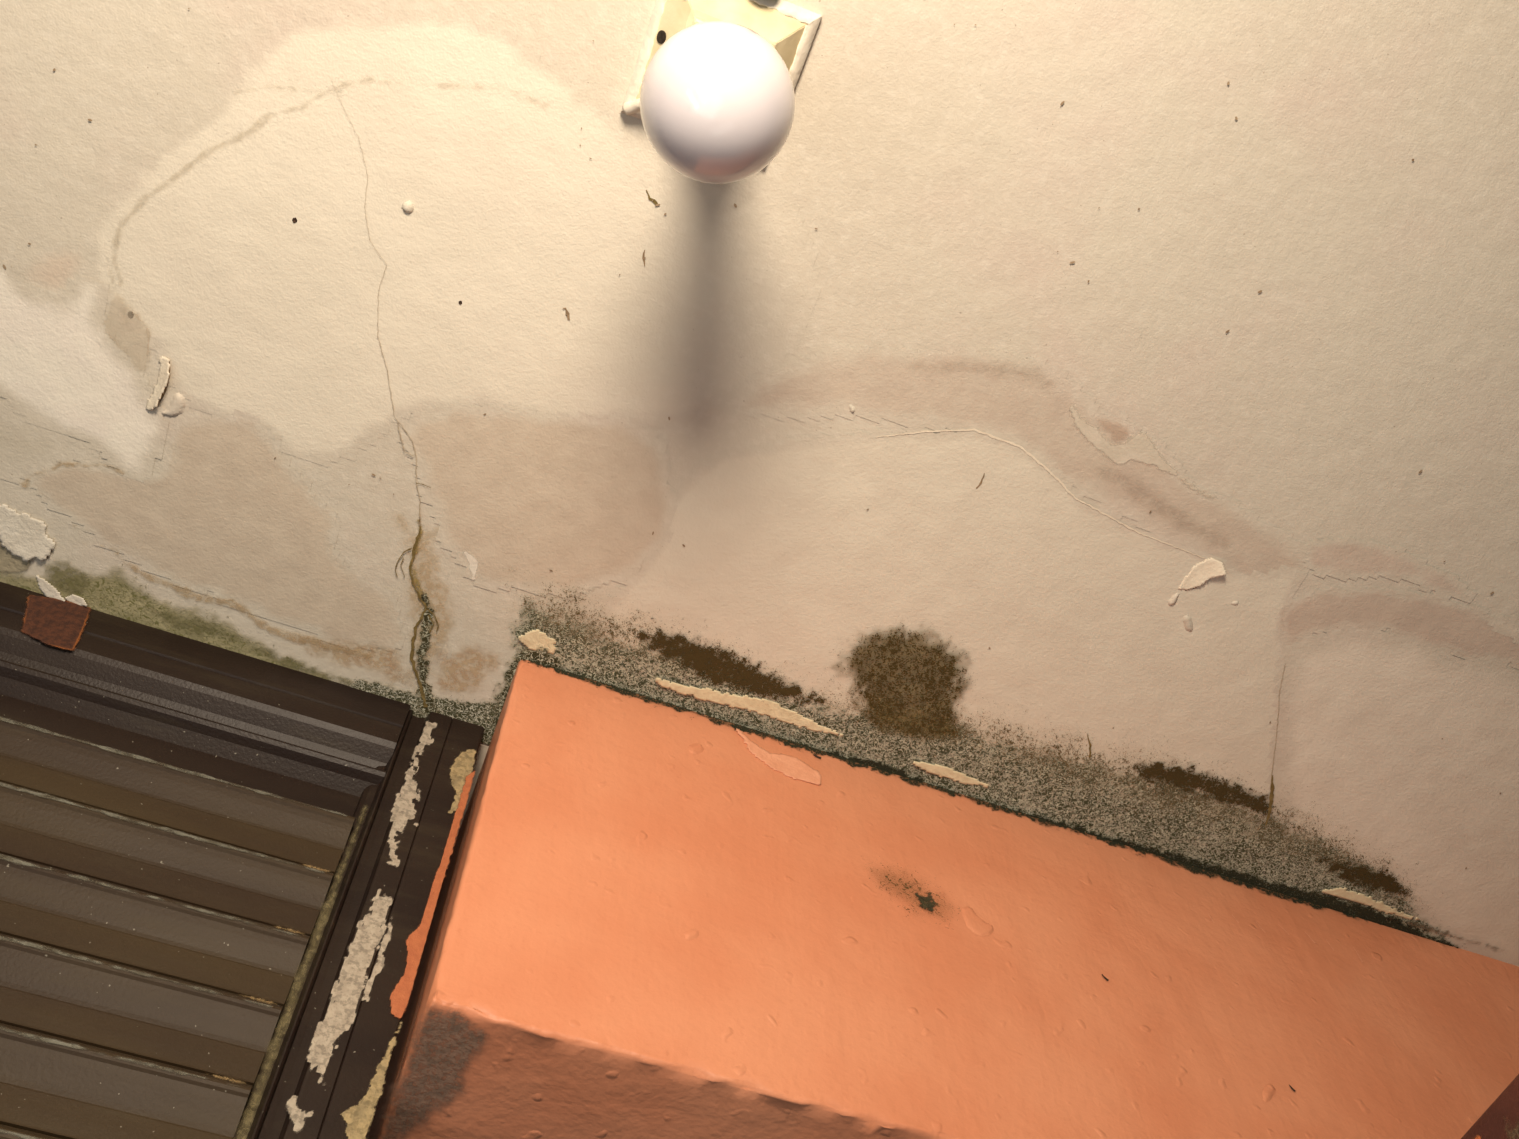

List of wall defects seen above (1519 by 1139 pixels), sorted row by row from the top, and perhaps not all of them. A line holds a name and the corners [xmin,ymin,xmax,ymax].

peeling [146,356,170,411]
crack [332,82,439,715]
peeling [0,503,87,607]
peeling [1178,558,1227,591]
corrosion [21,595,91,650]
peeling [655,677,844,737]
peeling [736,728,821,785]
peeling [913,761,989,788]
water stain [866,865,959,922]